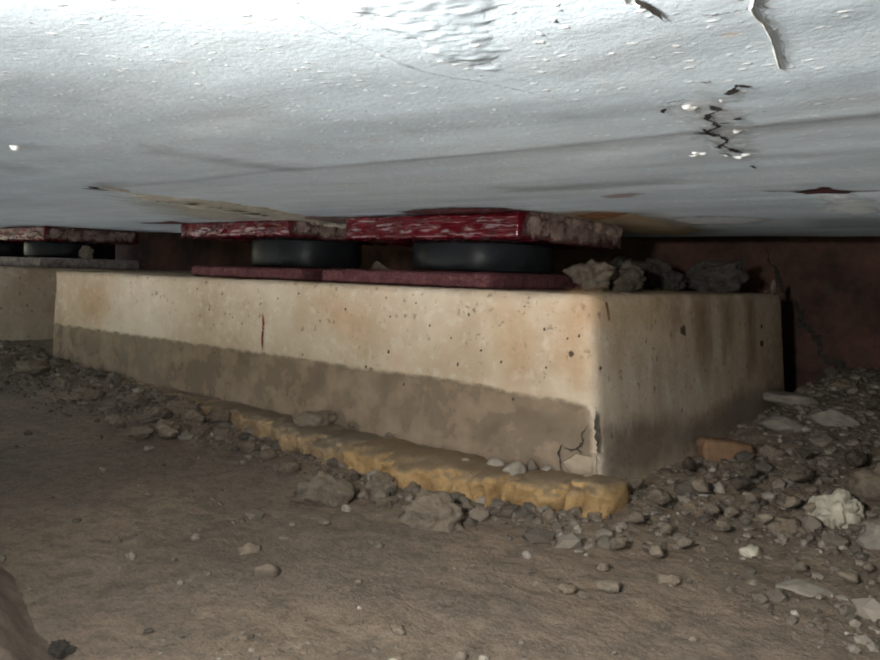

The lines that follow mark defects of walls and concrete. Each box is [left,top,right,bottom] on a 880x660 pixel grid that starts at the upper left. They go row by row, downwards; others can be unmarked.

crack [661,81,756,168]
peeling [81,186,333,223]
leakage [53,313,591,477]
crack [557,411,599,476]